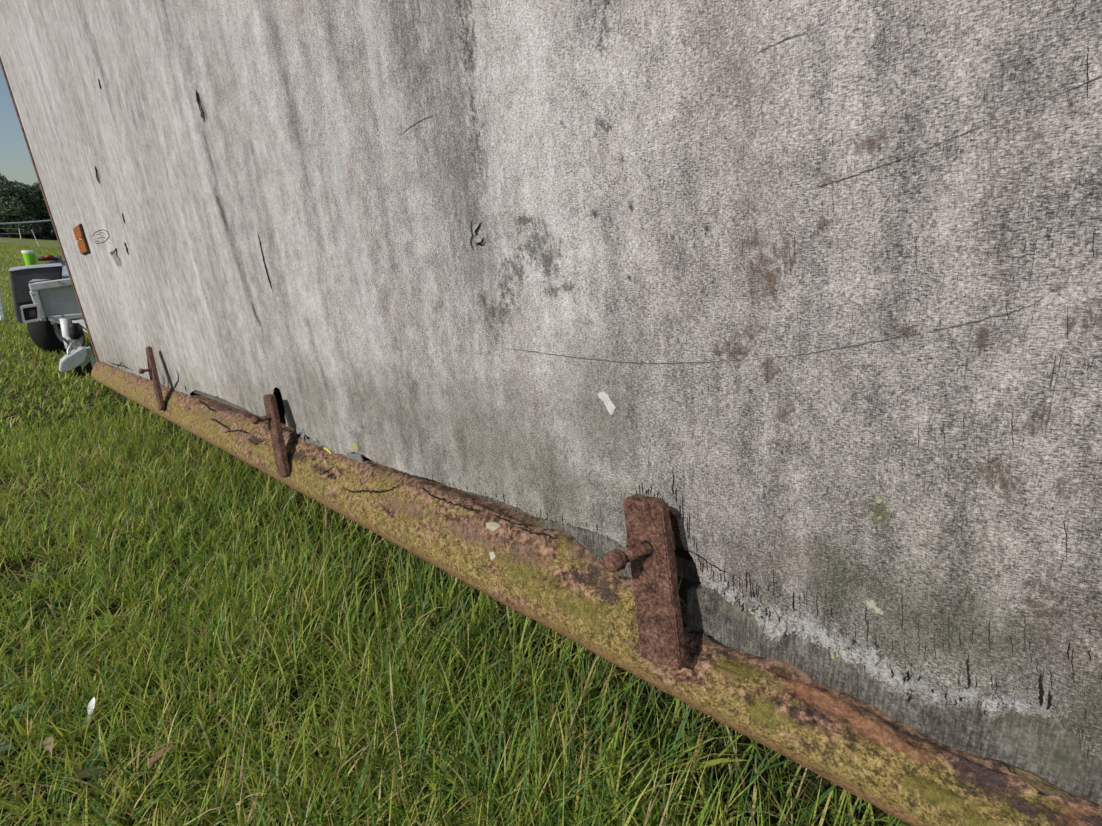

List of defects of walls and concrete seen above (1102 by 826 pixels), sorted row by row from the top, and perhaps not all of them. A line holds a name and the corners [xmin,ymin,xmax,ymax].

corrosion [569,564,619,605]
crack [636,474,1091,707]
leakage [703,568,942,702]
peeling [701,575,1056,718]
corrosion [781,674,935,765]
leakage [956,688,1033,715]
corrosion [950,755,1102,826]
crack [1004,764,1064,798]
peeling [1008,765,1072,798]